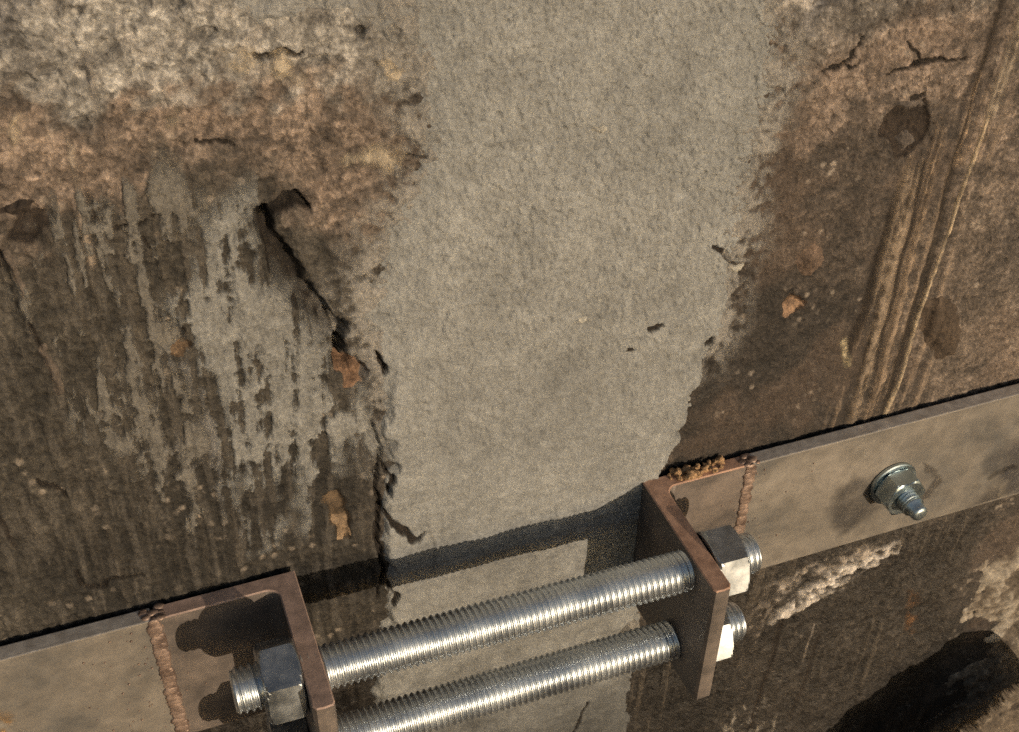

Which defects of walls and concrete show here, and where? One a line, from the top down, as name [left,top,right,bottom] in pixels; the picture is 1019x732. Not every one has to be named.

peeling [273,50,291,77]
peeling [380,58,404,81]
crack [821,36,863,71]
crack [887,40,967,74]
peeling [344,146,400,170]
crack [253,188,347,360]
crack [375,350,387,374]
crack [373,450,424,606]
leakage [746,543,899,644]